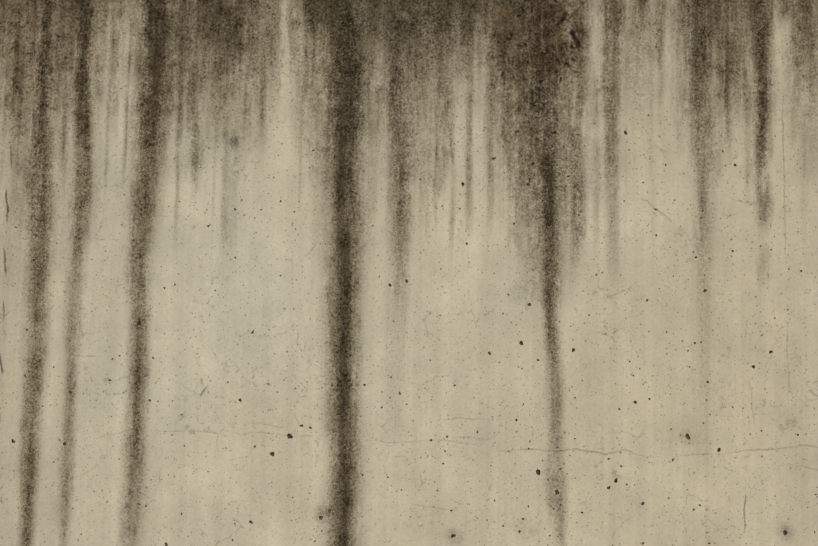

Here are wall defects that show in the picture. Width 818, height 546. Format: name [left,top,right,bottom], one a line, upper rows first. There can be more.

leakage [21,0,54,546]
leakage [72,0,92,287]
leakage [127,0,172,534]
leakage [324,8,363,546]
leakage [389,56,409,259]
leakage [506,0,583,445]
leakage [603,0,619,166]
leakage [689,0,710,150]
leakage [754,12,769,168]
leakage [62,361,75,517]